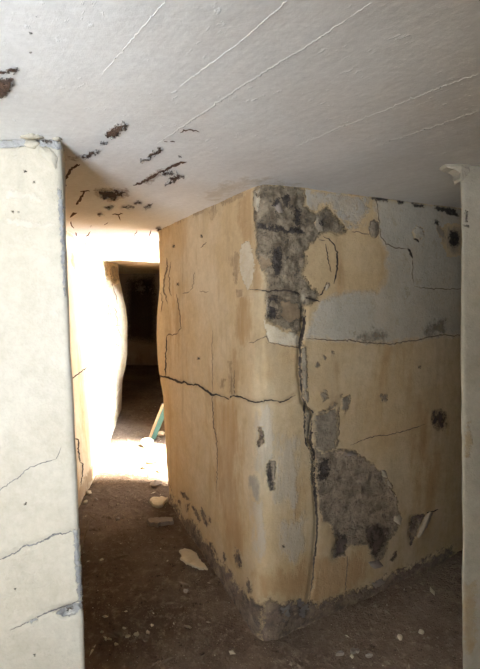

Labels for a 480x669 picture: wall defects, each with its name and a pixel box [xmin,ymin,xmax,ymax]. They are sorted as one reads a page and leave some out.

crack [354,199,461,290]
crack [160,237,338,599]
crack [0,448,61,490]
flaking render [311,389,438,569]
crack [0,531,72,560]
water stain [168,481,457,641]
crack [11,600,83,630]